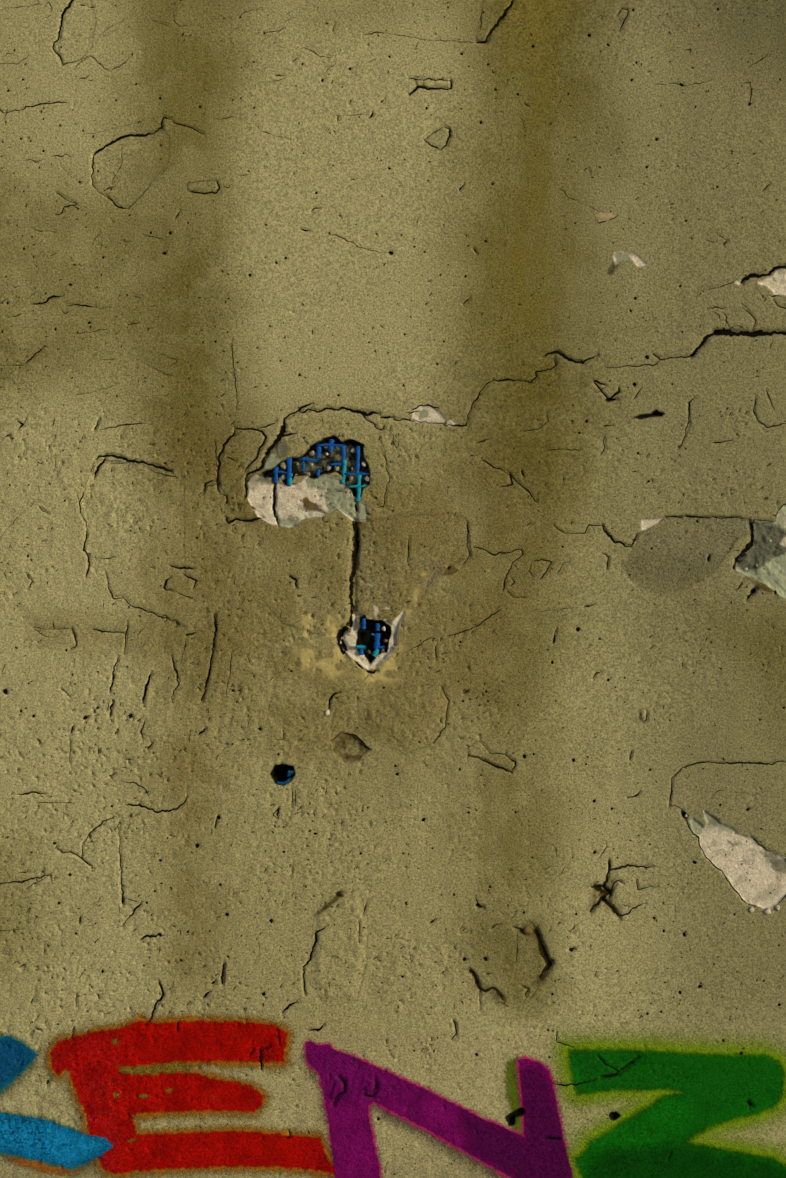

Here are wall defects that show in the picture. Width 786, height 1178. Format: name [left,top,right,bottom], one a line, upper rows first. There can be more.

crack [0,0,182,113]
crack [333,77,452,118]
crack [363,0,514,44]
crack [26,117,230,240]
spalling [758,268,786,296]
crack [33,420,252,749]
peeling [247,435,469,670]
peeling [620,505,786,599]
crack [469,742,516,772]
crack [669,761,786,908]
spalling [689,803,786,909]
crack [451,843,653,1040]